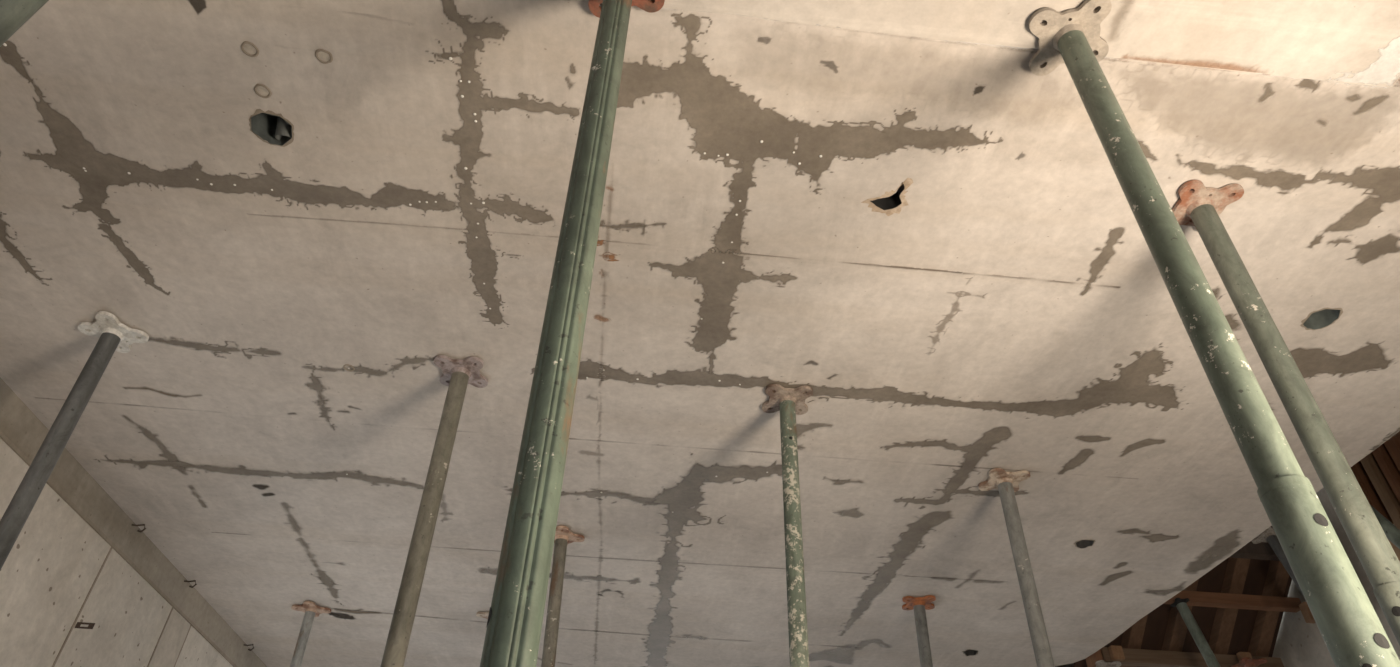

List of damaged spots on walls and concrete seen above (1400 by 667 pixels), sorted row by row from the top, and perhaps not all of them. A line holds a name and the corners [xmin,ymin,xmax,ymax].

spalling [188,0,206,14]
damp [1259,83,1274,102]
damp [1296,79,1319,92]
peeling [1328,37,1400,88]
damp [1347,95,1388,114]
damp [0,0,579,326]
spalling [861,178,913,216]
damp [1176,155,1400,264]
damp [549,13,1188,667]
damp [1290,342,1391,378]
damp [95,416,424,507]
damp [282,503,342,605]